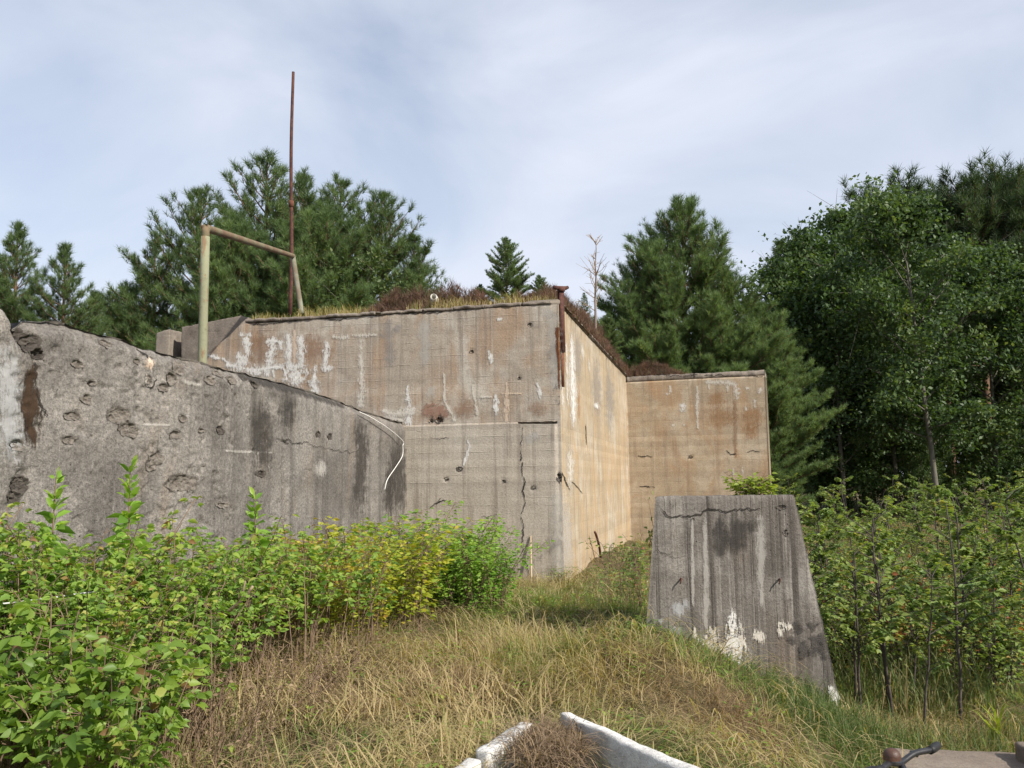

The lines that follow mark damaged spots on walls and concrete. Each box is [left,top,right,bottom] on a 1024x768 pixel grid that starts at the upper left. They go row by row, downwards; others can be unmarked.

spalling [10,327,45,360]
spalling [7,475,30,503]
rust [21,362,46,448]
spalling [106,405,139,438]
spalling [133,357,185,392]
water stain [207,330,377,464]
crack [277,438,359,453]
water stain [353,424,369,513]
water stain [382,384,416,518]
crack [520,428,529,578]
crack [640,486,760,518]
efflorescence [693,608,765,667]